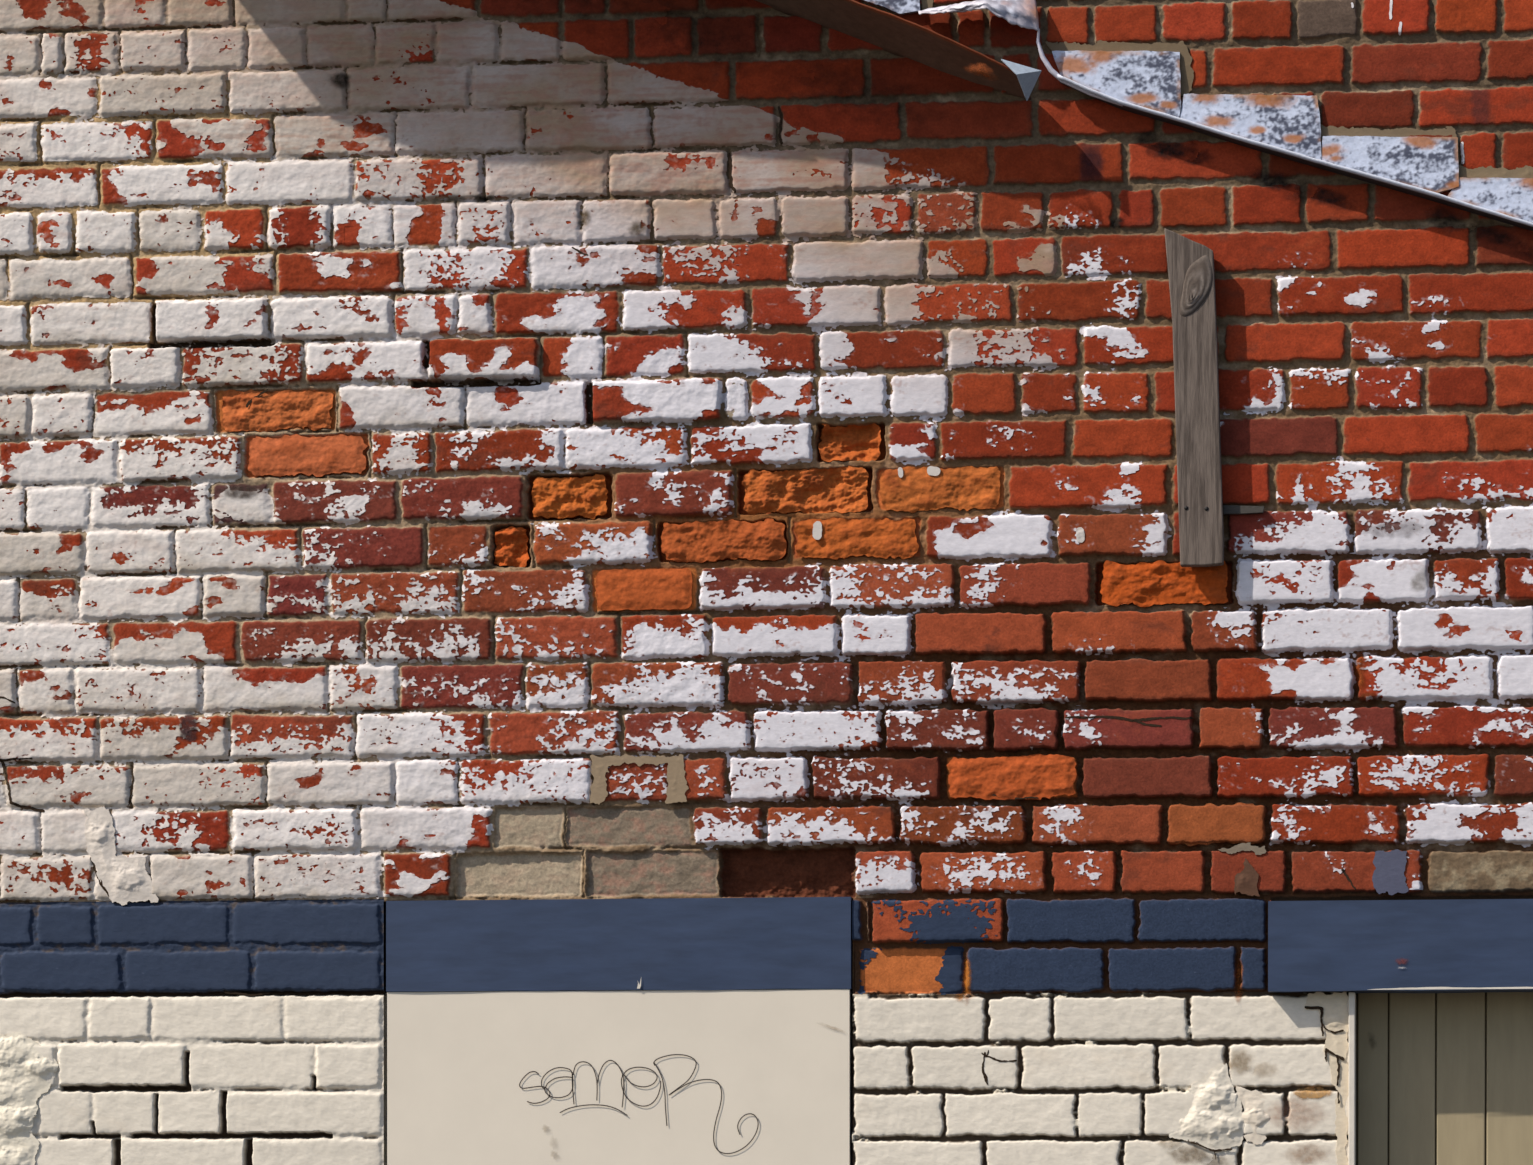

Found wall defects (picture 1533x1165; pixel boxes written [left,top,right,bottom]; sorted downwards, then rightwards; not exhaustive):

crack [0,758,45,812]
peeling [0,0,1148,995]
peeling [1091,456,1533,890]